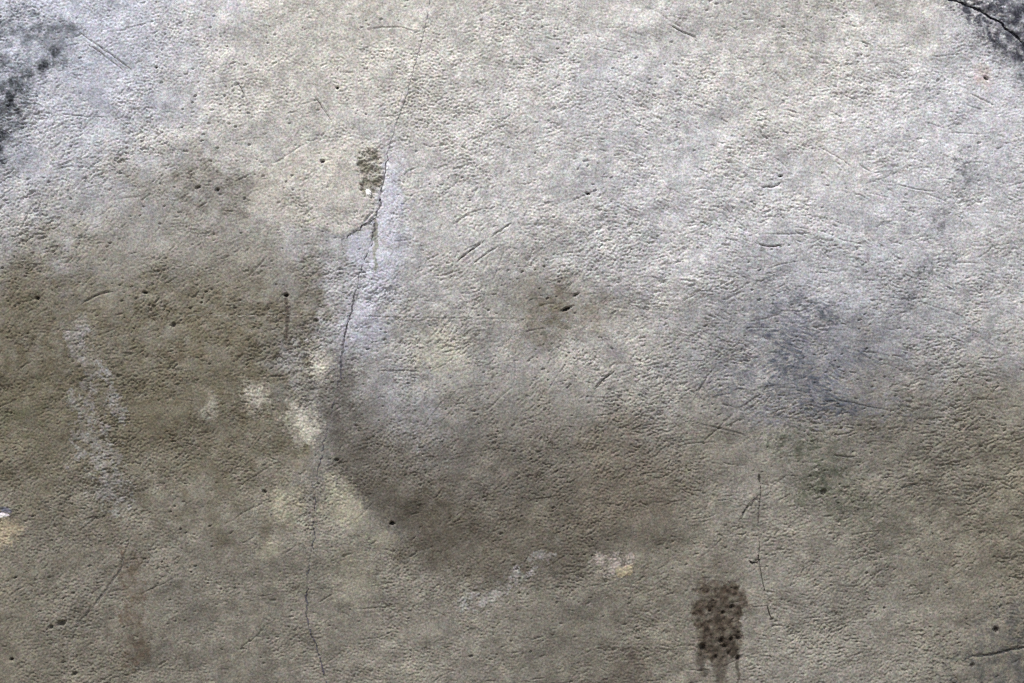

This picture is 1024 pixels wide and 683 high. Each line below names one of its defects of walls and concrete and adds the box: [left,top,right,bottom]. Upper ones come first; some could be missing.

crack [304,0,430,683]
water stain [370,112,416,181]
water stain [0,127,992,683]
crack [948,0,1024,46]